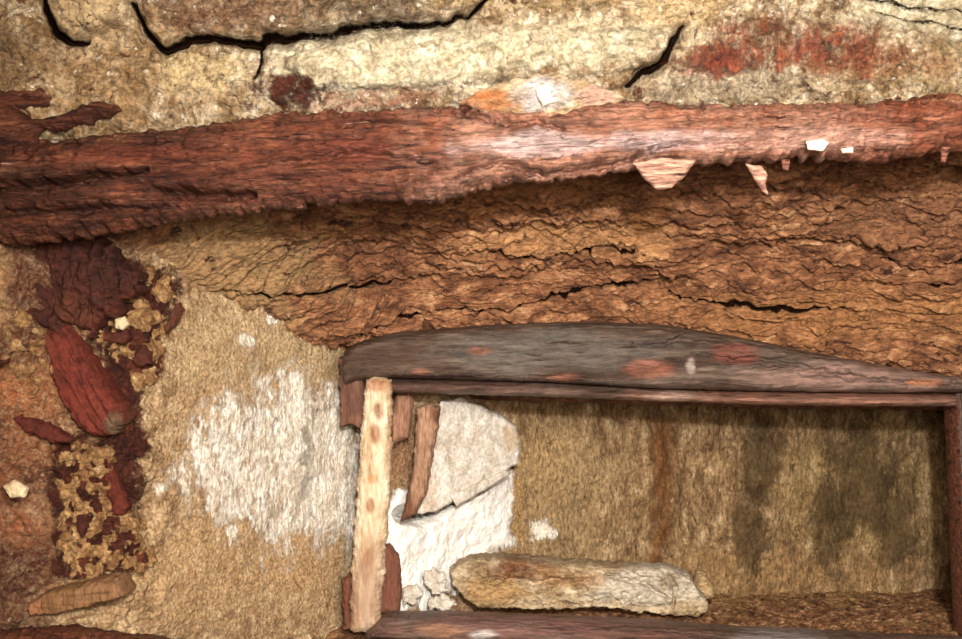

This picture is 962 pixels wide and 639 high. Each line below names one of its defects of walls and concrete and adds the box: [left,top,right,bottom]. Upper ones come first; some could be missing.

crack [43,0,91,47]
crack [131,0,488,80]
crack [624,25,684,88]
leakage [238,333,255,347]
leakage [155,358,361,562]
leakage [734,412,784,572]